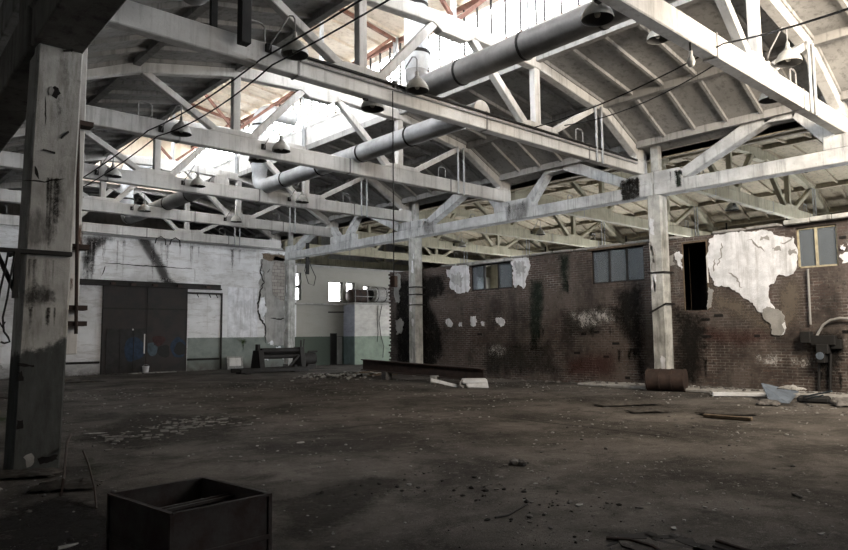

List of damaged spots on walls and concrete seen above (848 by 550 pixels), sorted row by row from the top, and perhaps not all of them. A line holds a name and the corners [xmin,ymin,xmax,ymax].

hole [48,86,61,99]
leakage [47,178,61,226]
mould [620,177,640,200]
peeling [446,264,471,294]
peeling [511,257,531,289]
peeling [669,252,683,268]
peeling [701,230,798,335]
peeling [839,233,848,263]
leakage [25,285,55,323]
spalling [257,253,287,348]
leakage [484,280,555,374]